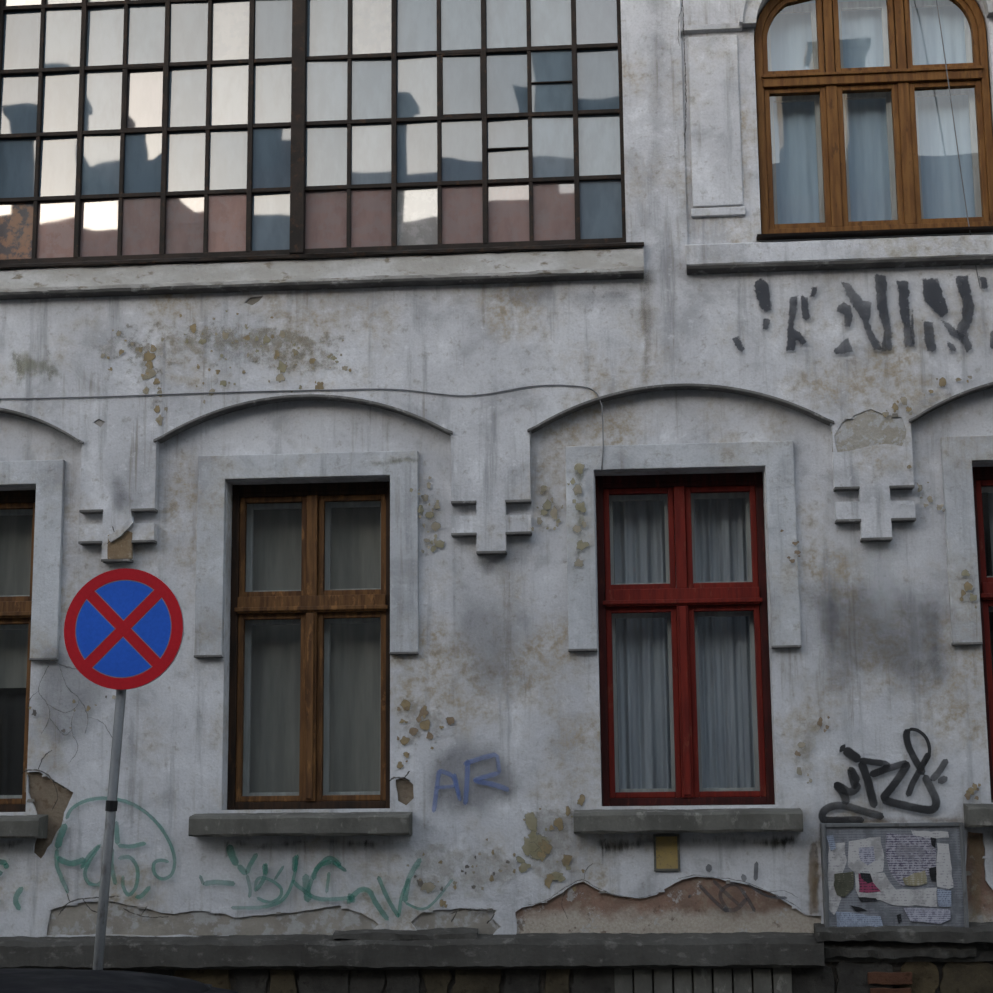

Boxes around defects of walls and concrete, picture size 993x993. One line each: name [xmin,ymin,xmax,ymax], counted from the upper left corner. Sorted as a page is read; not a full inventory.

peeling [101,330,168,425]
peeling [184,324,300,404]
flaking render [831,397,912,452]
flaking render [107,516,134,559]
peeling [410,476,445,553]
peeling [531,463,589,567]
crack [22,659,112,810]
peeling [396,700,454,805]
flaking render [25,768,73,858]
flaking render [47,901,379,936]
flaking render [407,794,821,934]
flaking render [966,832,993,923]